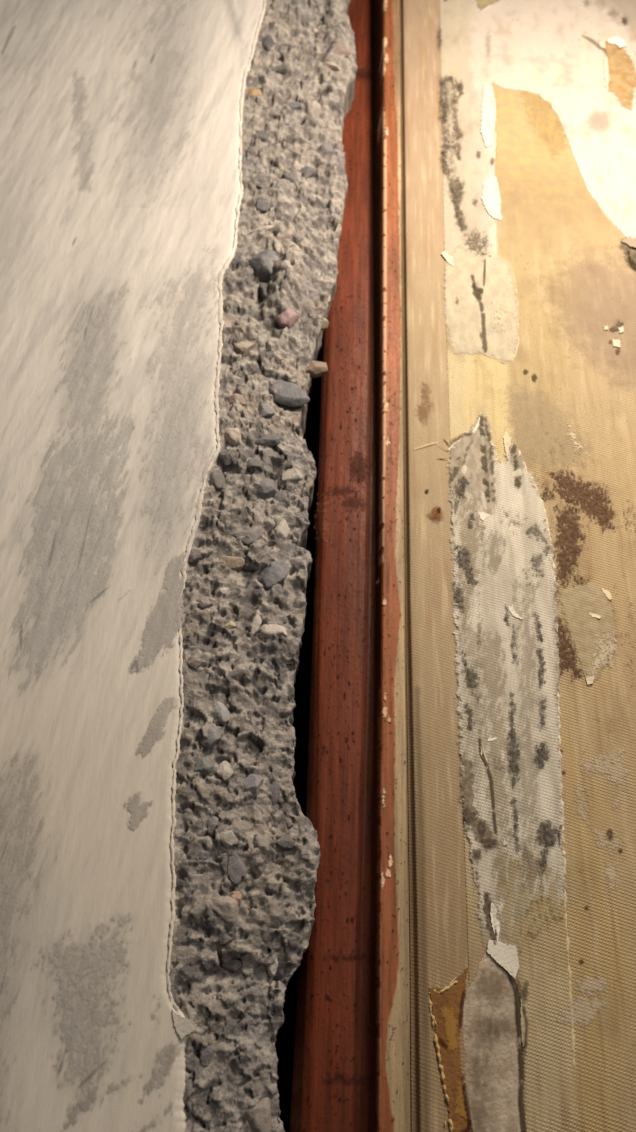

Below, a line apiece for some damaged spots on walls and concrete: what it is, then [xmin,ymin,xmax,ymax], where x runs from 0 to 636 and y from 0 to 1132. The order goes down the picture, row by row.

peeling [477,0,501,12]
peeling [598,36,636,110]
damp [465,233,491,256]
flaking render [441,244,519,364]
peeling [481,83,636,271]
spalling [604,321,624,354]
spalling [61,0,358,1132]
damp [502,438,636,727]
flaking render [437,411,619,1132]
damp [494,692,563,875]